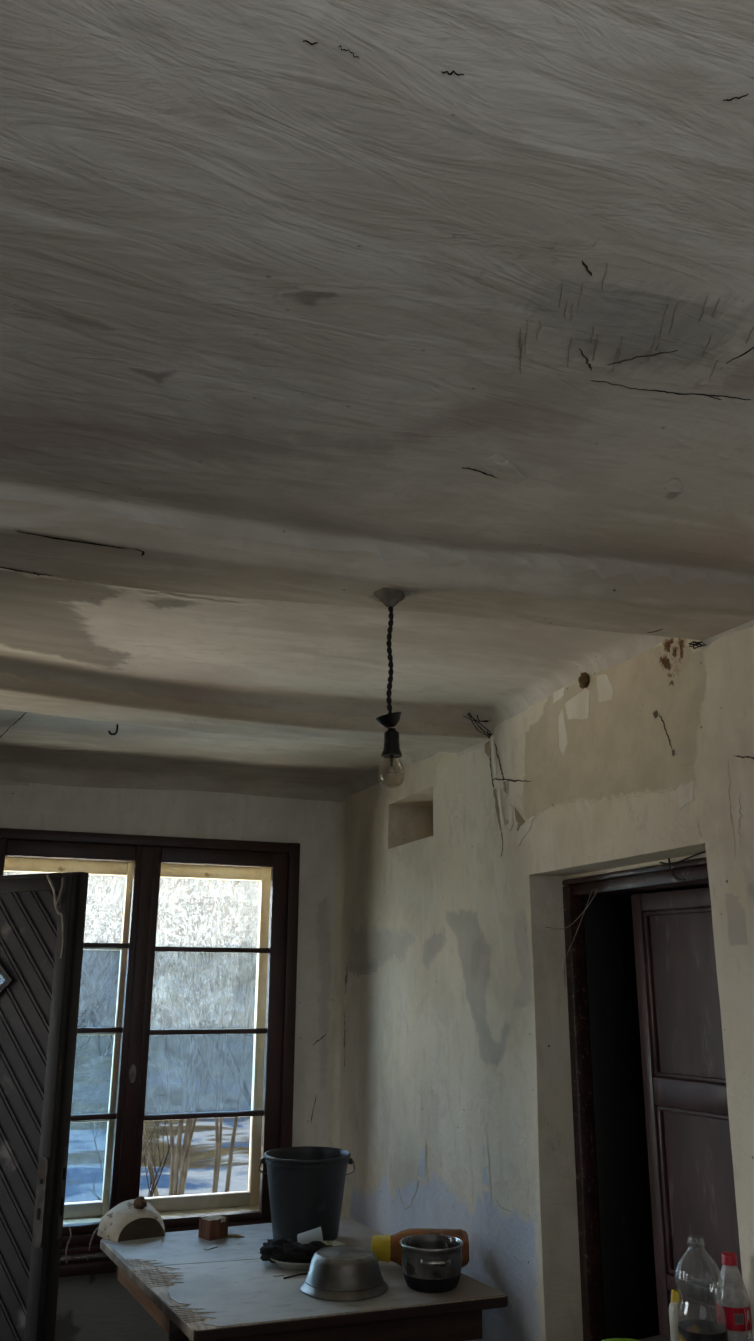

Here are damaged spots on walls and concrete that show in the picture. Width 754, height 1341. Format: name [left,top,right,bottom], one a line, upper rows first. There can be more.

crack [591,380,751,400]
peeling [484,639,712,833]
crack [652,708,676,758]